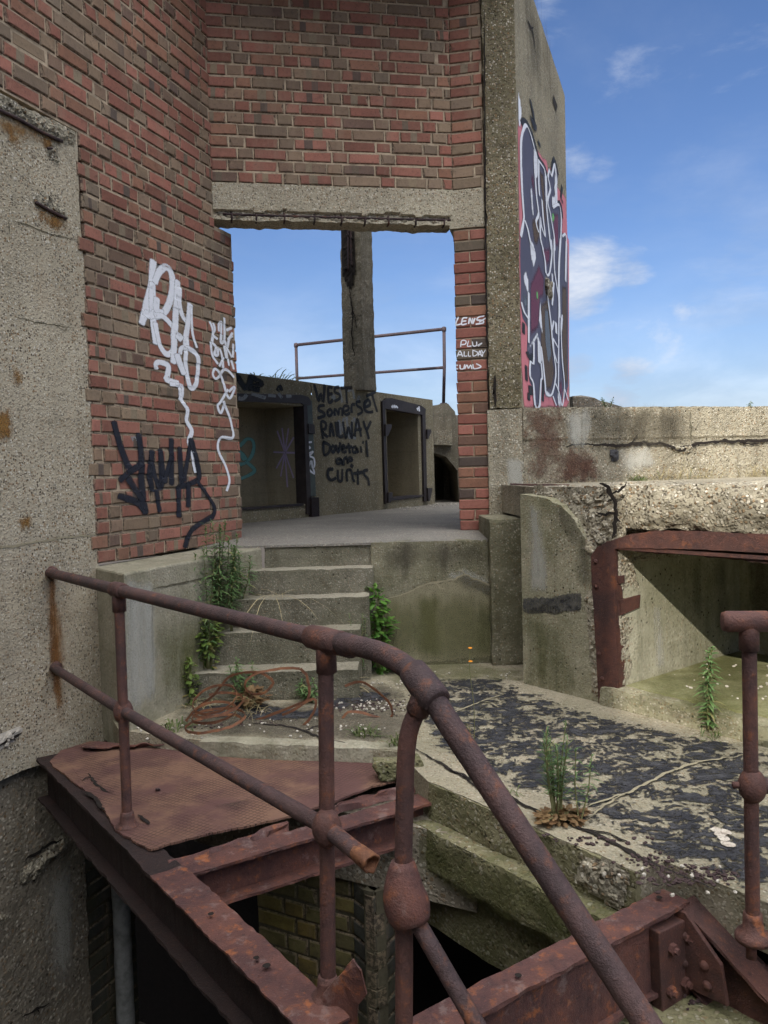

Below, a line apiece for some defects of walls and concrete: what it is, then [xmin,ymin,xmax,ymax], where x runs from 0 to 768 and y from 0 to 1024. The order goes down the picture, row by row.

spalling [217,211,451,289]
crack [349,288,357,356]
crack [566,412,768,452]
crack [596,482,627,539]
rust [50,579,62,700]
crack [581,754,743,817]